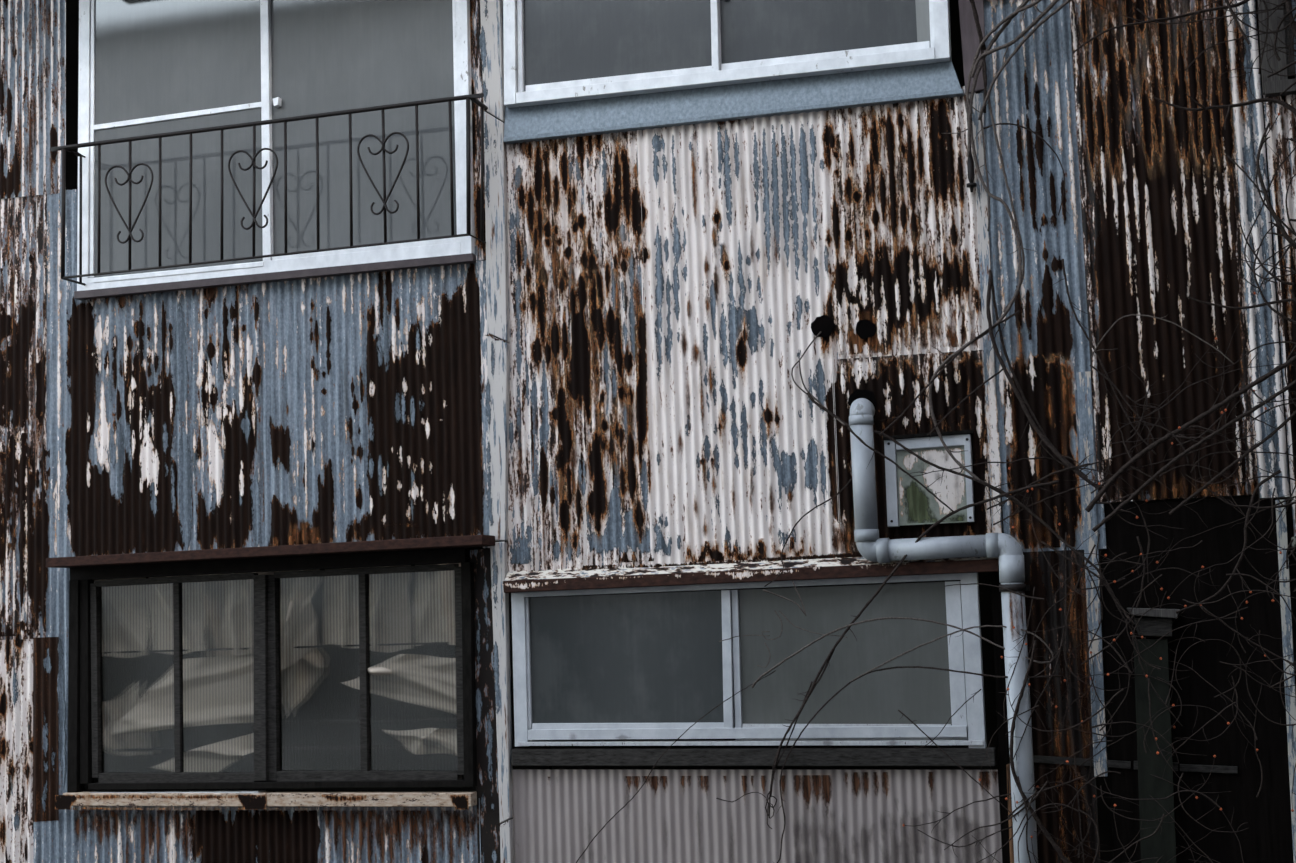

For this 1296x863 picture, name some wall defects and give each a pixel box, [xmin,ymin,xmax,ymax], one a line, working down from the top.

peeling [0,428,28,707]
peeling [45,200,63,428]
peeling [87,264,467,551]
peeling [602,130,693,443]
corrosion [513,94,989,570]
peeling [685,122,973,552]
corrosion [1004,70,1095,863]
corrosion [1080,0,1257,501]
corrosion [1269,97,1296,491]
peeling [77,817,191,863]
corrosion [625,776,726,794]
corrosion [742,772,888,809]